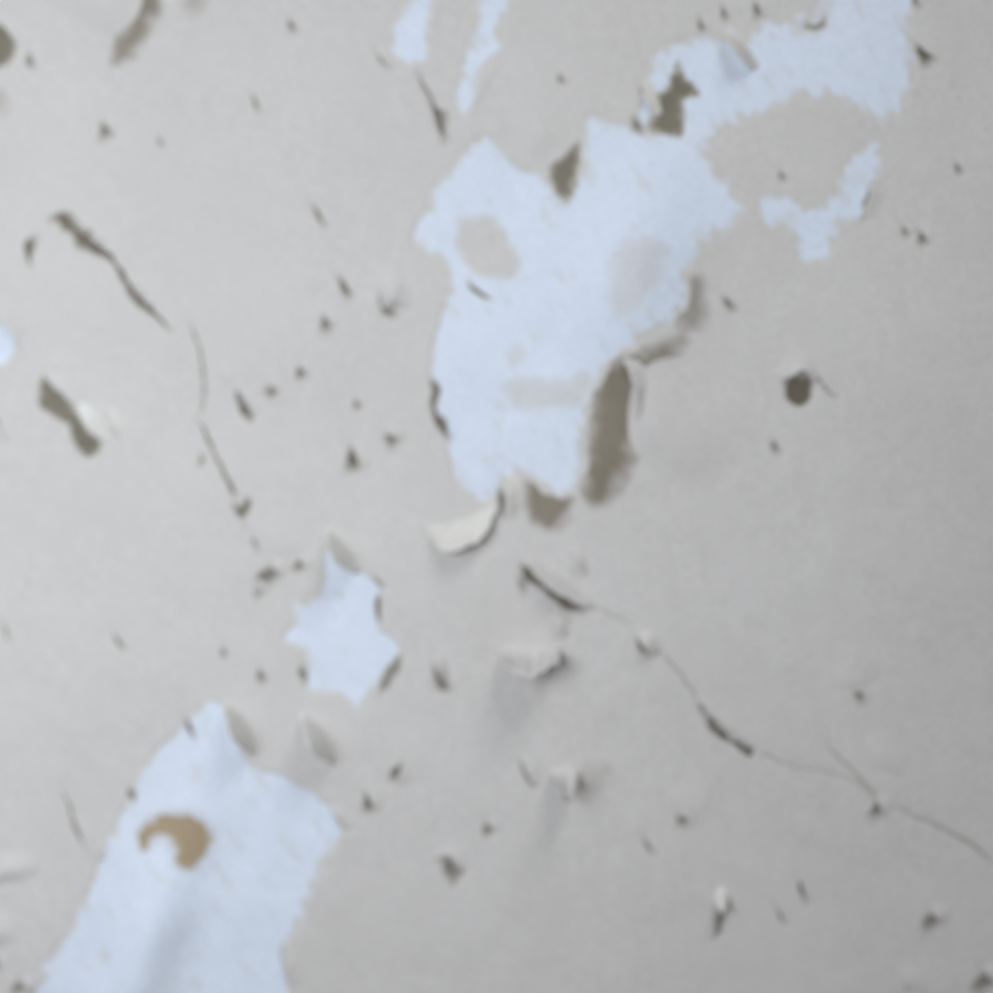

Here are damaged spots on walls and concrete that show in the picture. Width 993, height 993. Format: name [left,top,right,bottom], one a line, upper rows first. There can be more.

peeling [376,0,436,71]
peeling [412,0,939,552]
crack [22,209,260,555]
peeling [252,529,400,712]
rust [130,801,222,877]
peeling [9,699,352,993]
peeling [360,757,415,815]
crack [754,742,993,864]